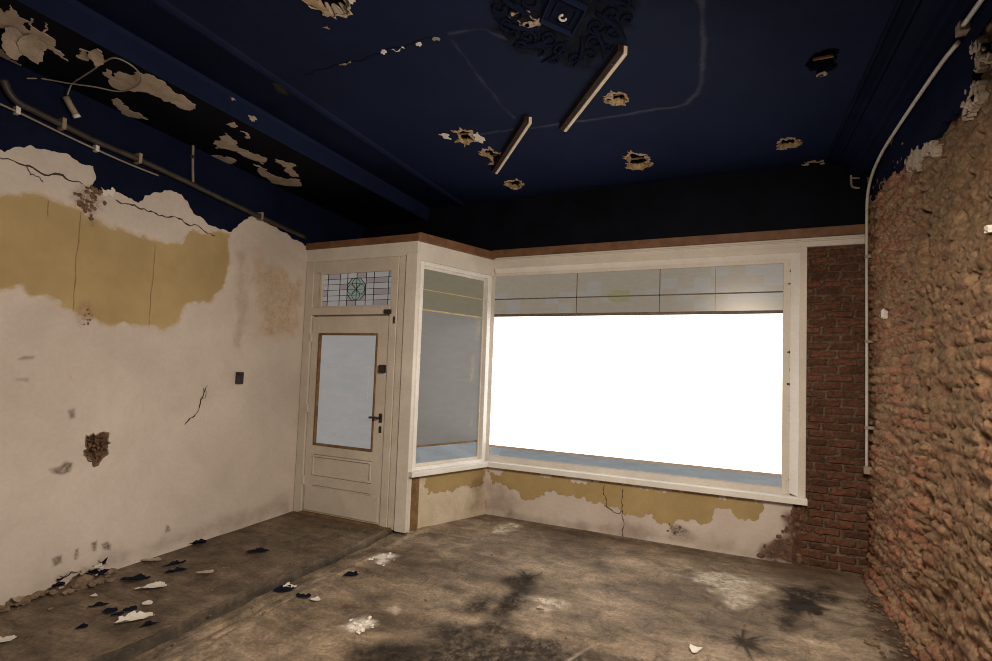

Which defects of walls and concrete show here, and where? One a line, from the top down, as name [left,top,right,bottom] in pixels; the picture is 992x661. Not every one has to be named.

peeling [302,0,334,29]
peeling [0,5,196,120]
flaking render [960,34,992,121]
peeling [211,122,302,186]
peeling [439,130,486,143]
flaking render [904,140,944,172]
crack [0,158,82,214]
flaking render [73,185,115,223]
crack [116,200,215,236]
spalling [83,431,111,467]
peeling [424,468,764,536]
water stain [346,569,657,661]